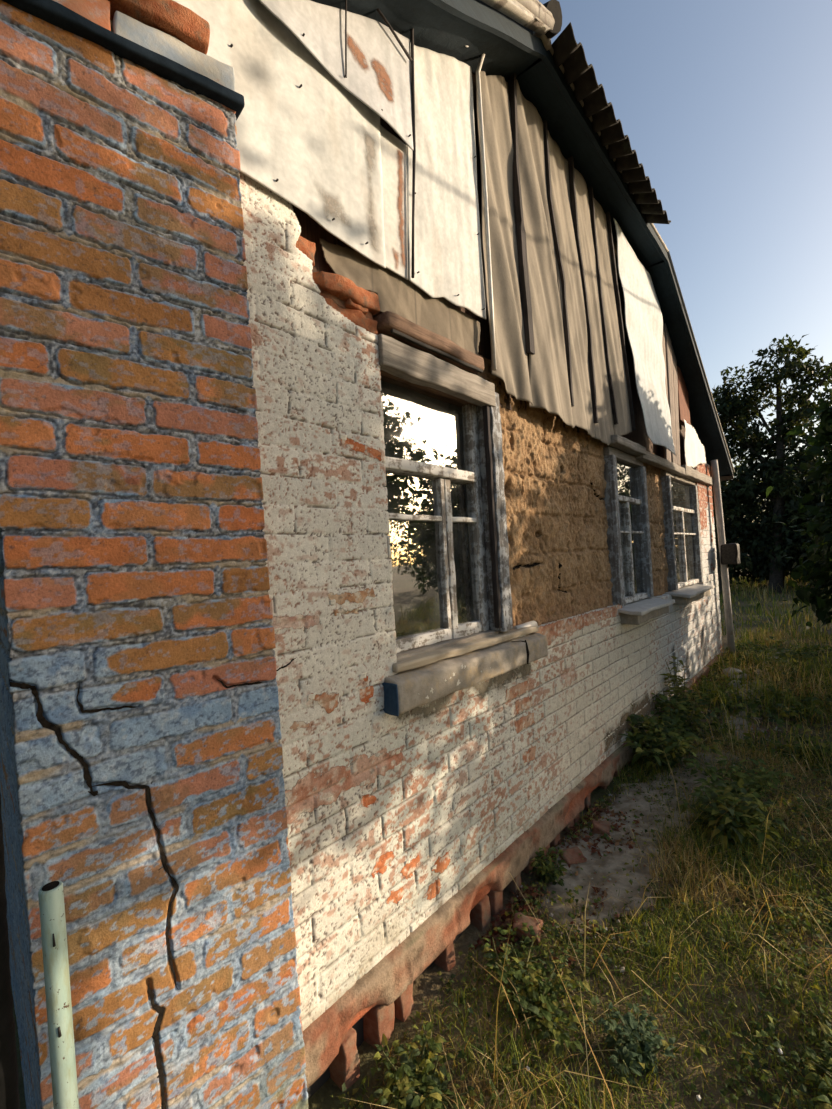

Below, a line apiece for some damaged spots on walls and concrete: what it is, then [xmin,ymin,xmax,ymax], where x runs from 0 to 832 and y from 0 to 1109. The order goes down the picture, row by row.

rust [347,36,393,101]
spalling [296,235,380,335]
peeling [339,433,381,461]
peeling [697,463,711,532]
peeling [328,588,375,616]
flaking render [536,603,622,645]
peeling [307,692,339,714]
peeling [505,681,535,733]
peeling [285,748,403,824]
crack [8,674,182,1109]
peeling [371,851,420,906]
peeling [423,852,450,900]